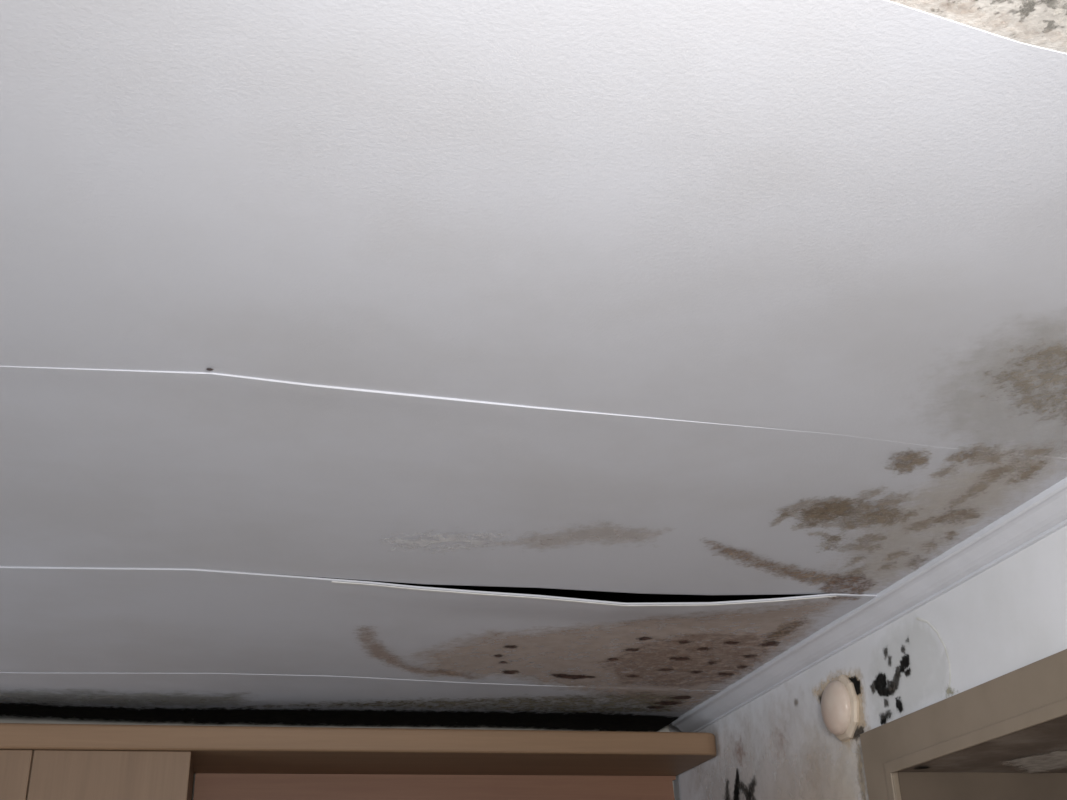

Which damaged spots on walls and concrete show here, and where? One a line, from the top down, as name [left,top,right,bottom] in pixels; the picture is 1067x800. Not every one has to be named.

leakage [1021,0,1067,32]
leakage [714,546,875,600]
crack [331,581,836,607]
leakage [658,621,800,676]
leakage [0,692,690,732]
leakage [800,638,911,800]
leakage [724,768,756,800]